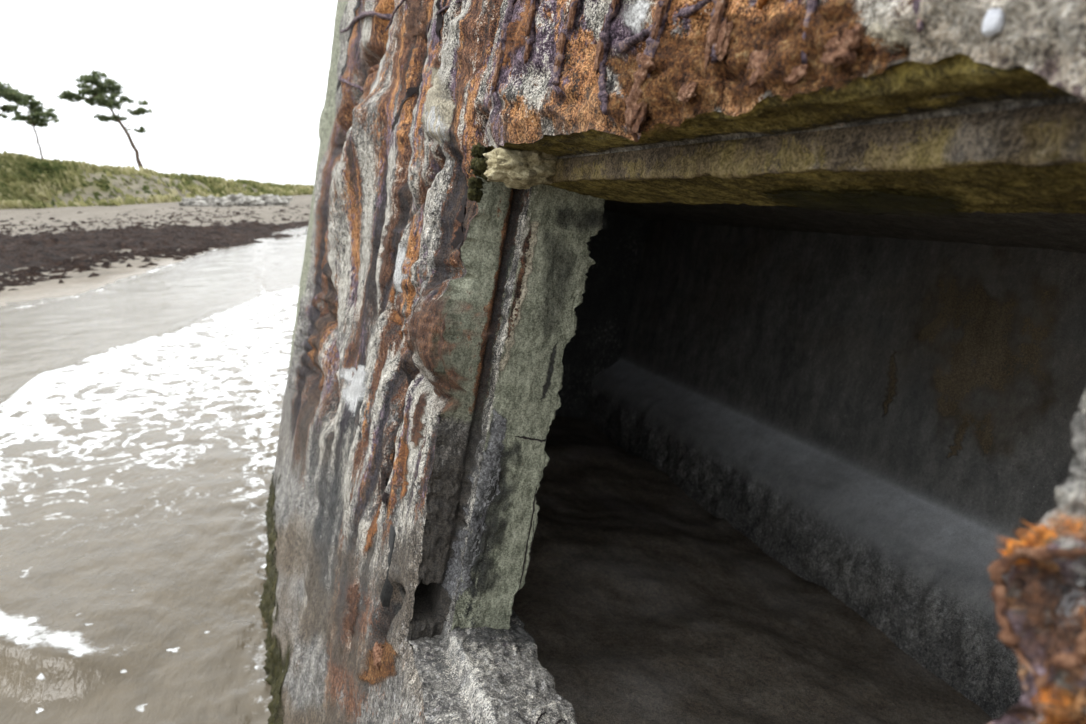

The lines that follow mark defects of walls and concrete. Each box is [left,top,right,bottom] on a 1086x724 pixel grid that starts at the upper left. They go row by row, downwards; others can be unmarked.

corrosion [403,0,434,41]
corrosion [502,0,531,66]
corrosion [627,53,656,111]
corrosion [379,218,403,340]
corrosion [390,392,426,500]
corrosion [363,491,385,554]
corrosion [999,518,1083,568]
corrosion [1031,688,1086,724]